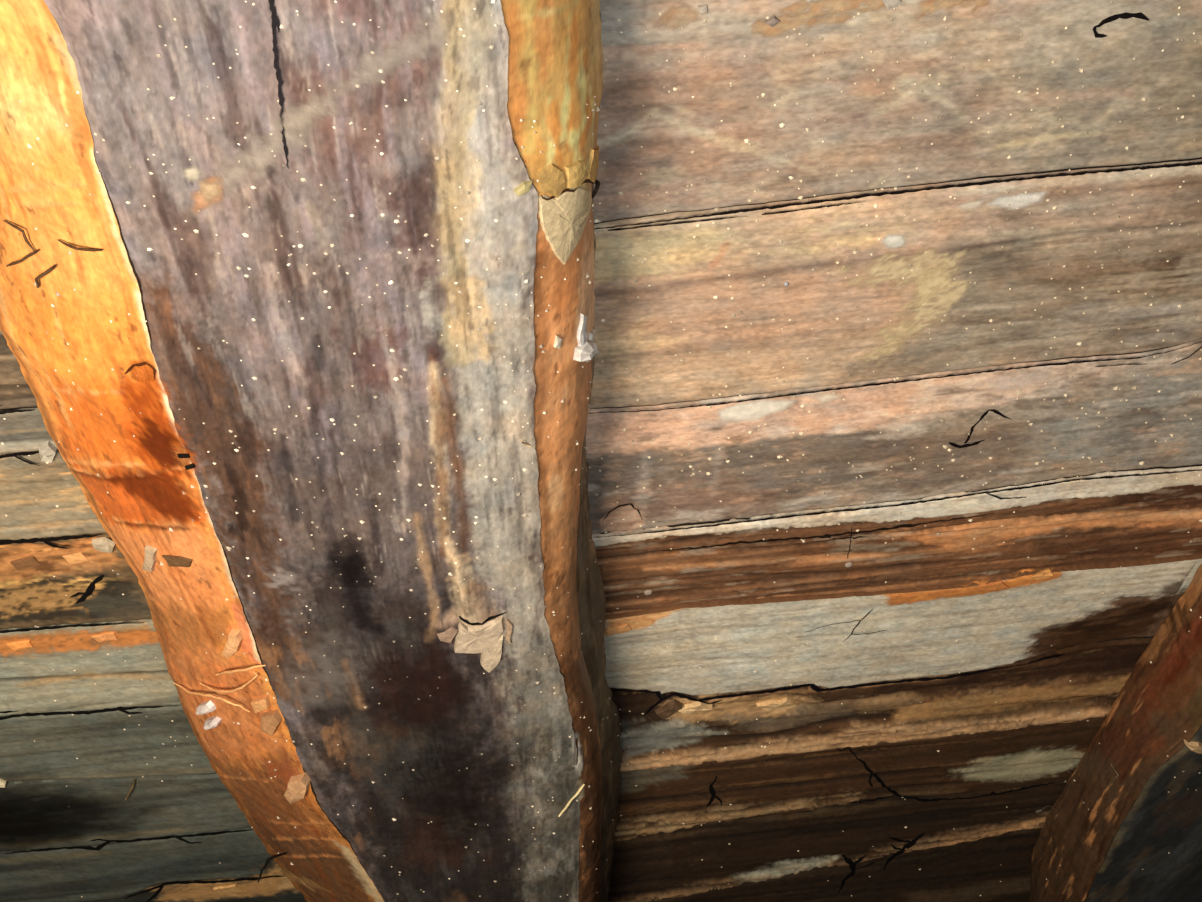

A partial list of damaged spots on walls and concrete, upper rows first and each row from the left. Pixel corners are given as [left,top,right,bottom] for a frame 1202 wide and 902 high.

crack [268,0,289,169]
water stain [336,541,380,631]
water stain [1034,582,1189,660]